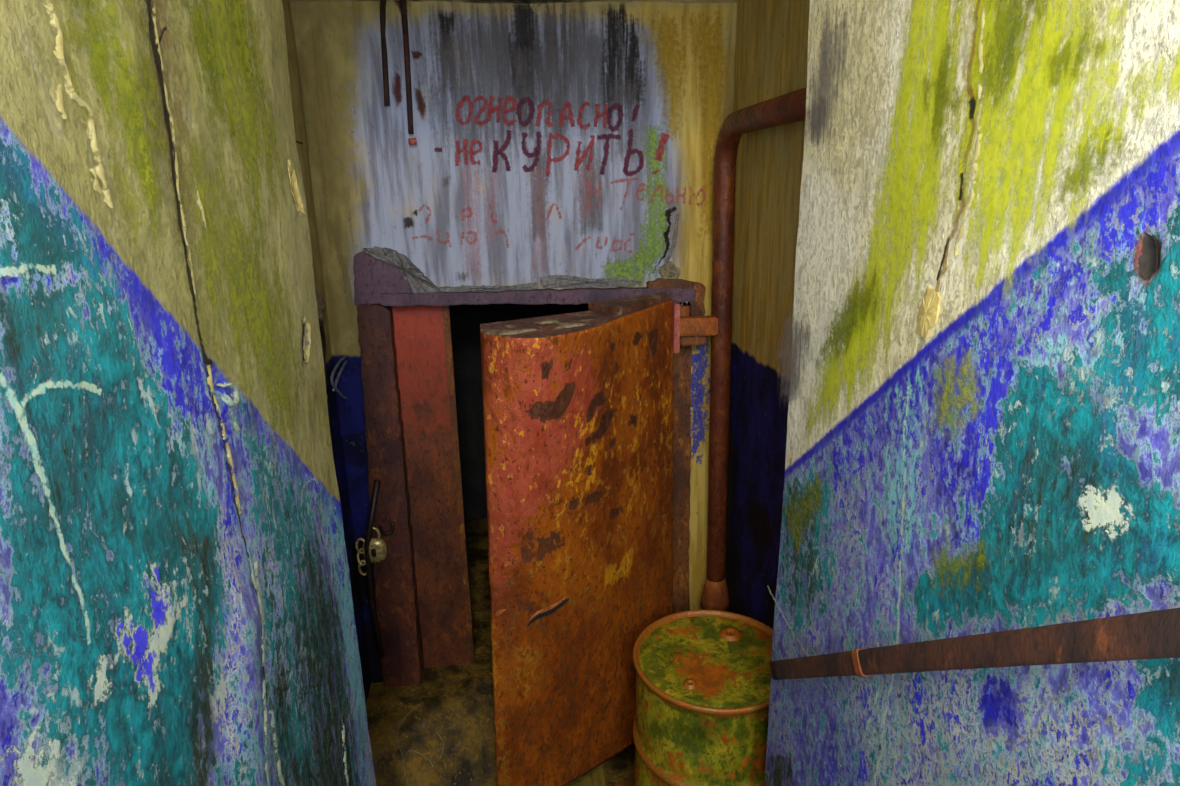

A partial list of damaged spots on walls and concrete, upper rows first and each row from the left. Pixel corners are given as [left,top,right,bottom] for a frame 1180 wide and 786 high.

damp [420,3,644,238]
damp [653,15,722,232]
crack [935,0,985,292]
crack [141,0,268,699]
peeling [1079,485,1135,541]
peeling [88,562,188,709]
peeling [0,721,79,786]